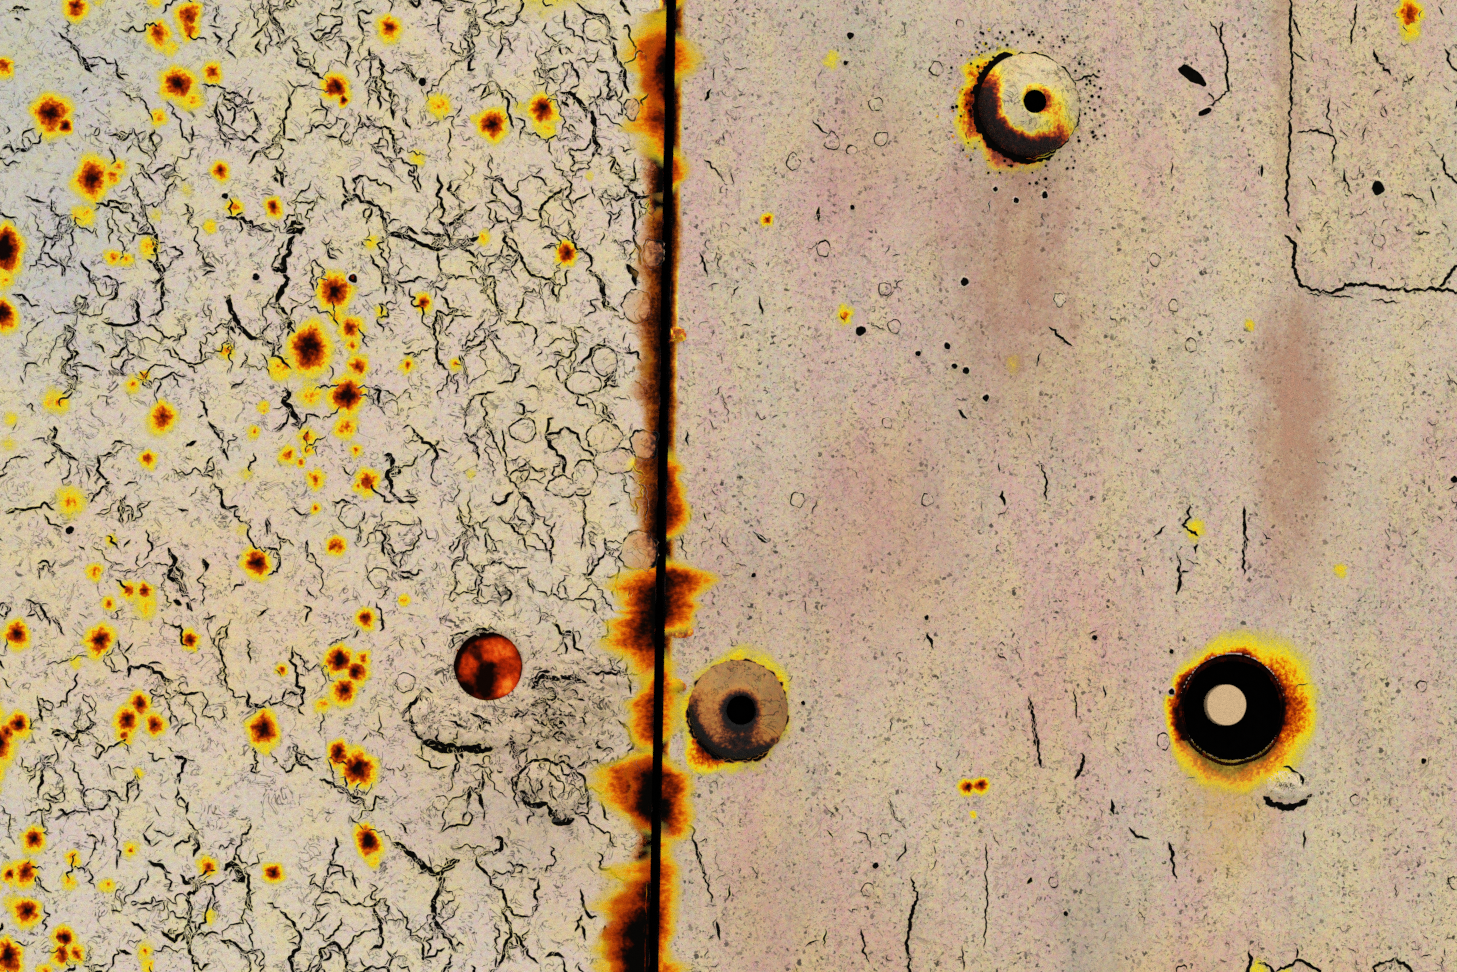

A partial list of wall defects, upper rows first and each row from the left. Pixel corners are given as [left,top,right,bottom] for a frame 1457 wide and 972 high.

rust [1394,0,1425,42]
rust [953,48,1045,174]
rust [0,220,27,335]
crack [1139,0,1457,563]
rust [268,270,386,515]
crack [0,0,657,972]
rust [590,0,790,972]
crack [678,0,1212,972]
crack [1074,476,1292,641]
rust [454,632,523,700]
rust [957,776,990,819]
rust [1163,632,1318,810]